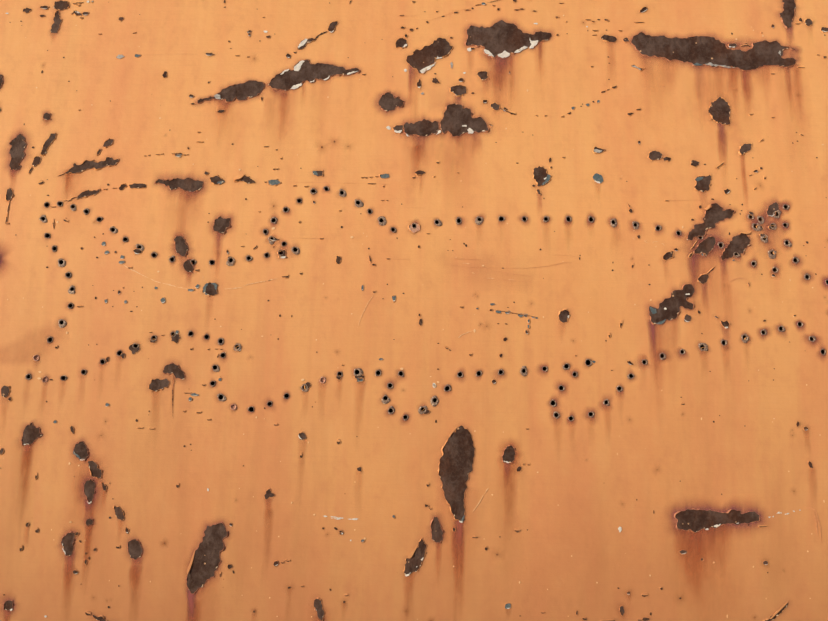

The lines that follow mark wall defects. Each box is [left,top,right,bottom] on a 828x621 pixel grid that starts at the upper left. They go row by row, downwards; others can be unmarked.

peeling [435,2,568,59]
peeling [585,0,828,75]
peeling [189,38,366,113]
peeling [9,124,57,174]
peeling [5,188,14,225]
peeling [686,160,779,261]
peeling [649,273,709,325]
peeling [403,425,475,577]
peeling [674,508,768,533]
peeling [186,522,234,594]